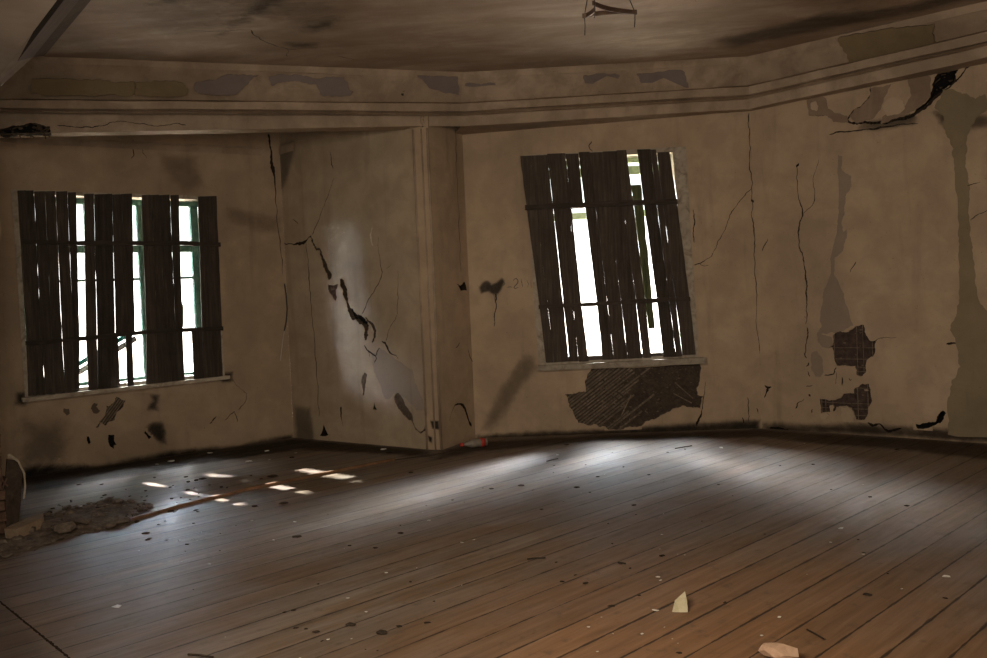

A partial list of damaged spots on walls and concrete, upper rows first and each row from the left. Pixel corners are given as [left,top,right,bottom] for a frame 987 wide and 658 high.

crack [815,67,969,135]
crack [268,134,398,363]
crack [796,160,852,413]
peeling [807,70,987,437]
spalling [87,397,125,449]
spalling [565,364,703,430]
crack [742,385,771,423]